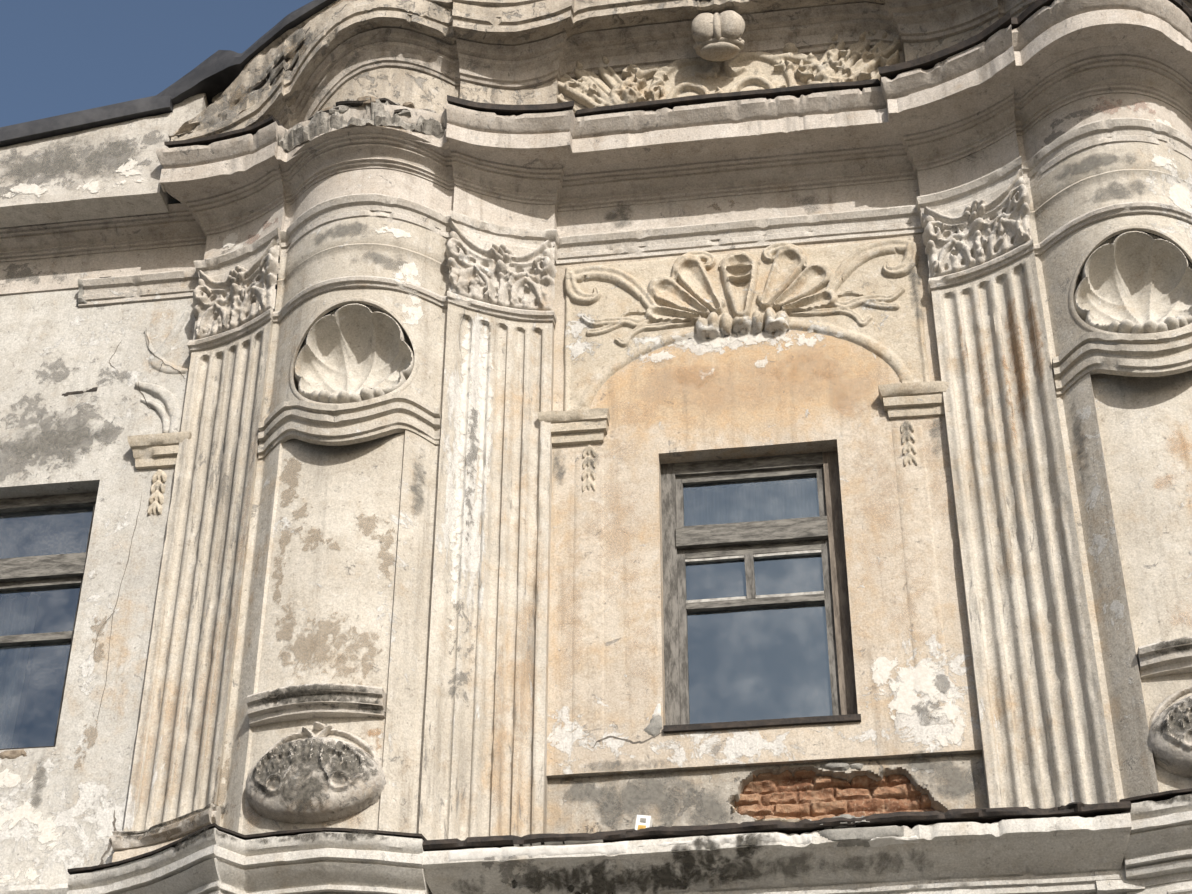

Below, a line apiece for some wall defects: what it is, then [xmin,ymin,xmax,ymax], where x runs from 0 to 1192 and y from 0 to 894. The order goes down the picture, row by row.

peeling [1,142,146,198]
spalling [279,96,446,151]
crack [93,495,142,737]
spalling [592,703,662,748]
peeling [871,653,965,747]
peeling [0,749,61,883]
water stain [512,777,809,894]
spalling [448,760,935,861]